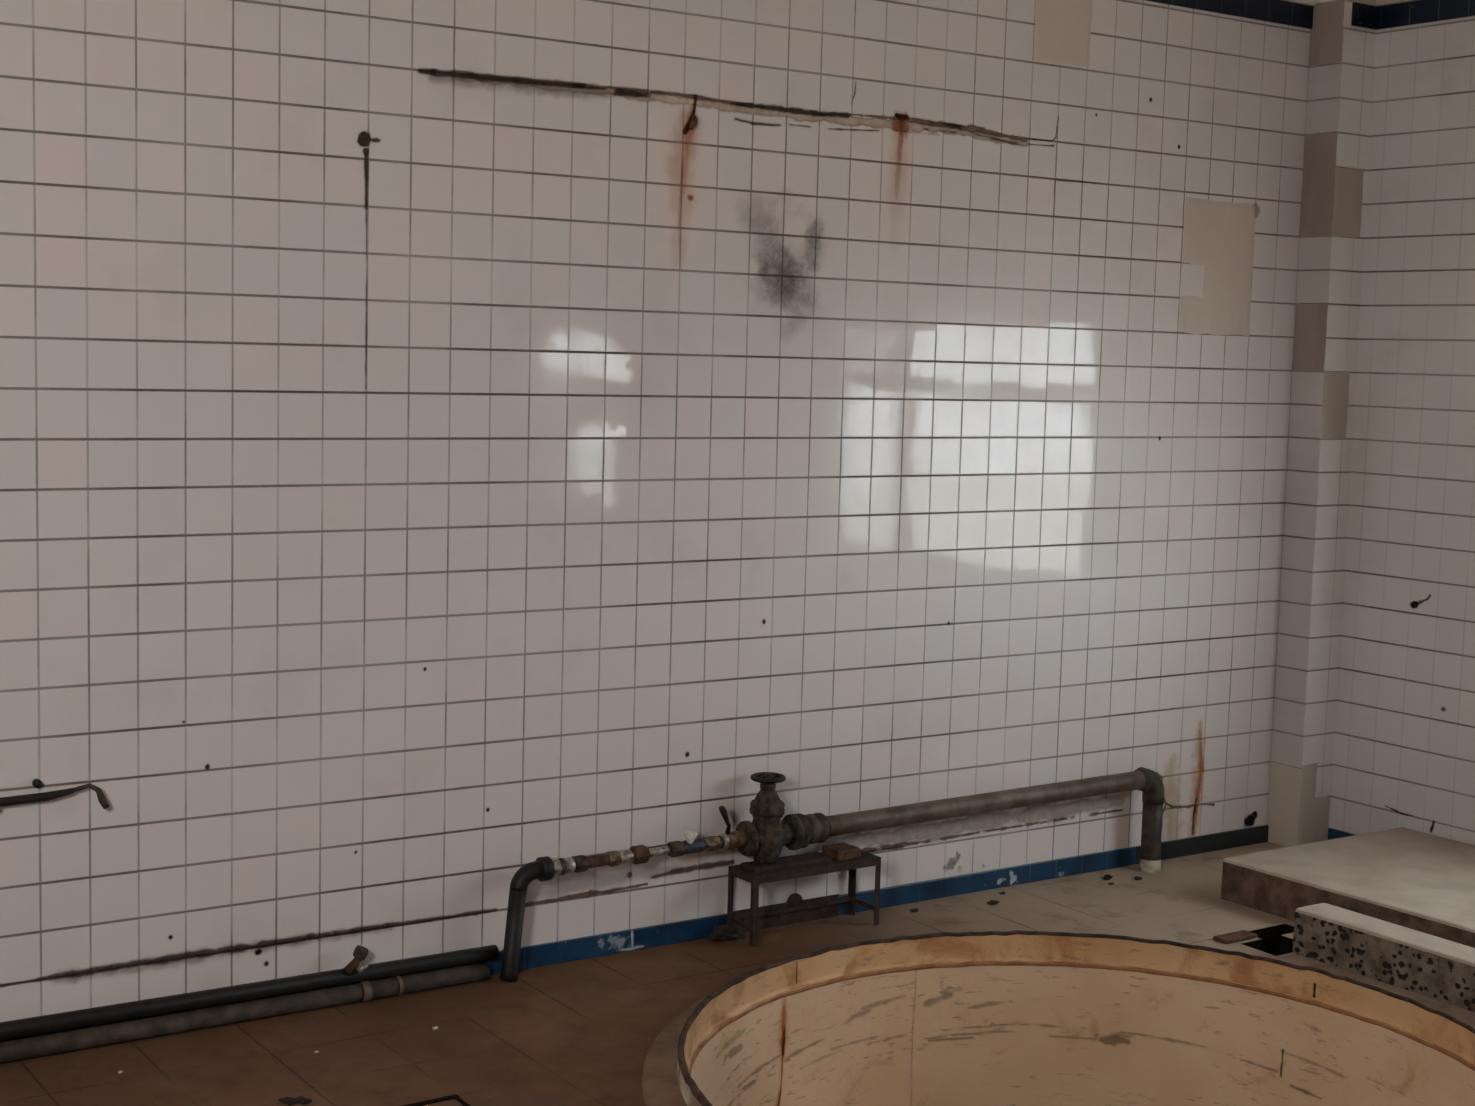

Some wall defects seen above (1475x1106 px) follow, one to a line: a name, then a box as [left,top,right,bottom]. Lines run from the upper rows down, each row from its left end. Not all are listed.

rust [683,95,697,134]
crack [418,69,1083,217]
crack [357,131,380,388]
rust [1192,752,1203,835]
water stain [0,909,497,987]
crack [777,961,798,1106]